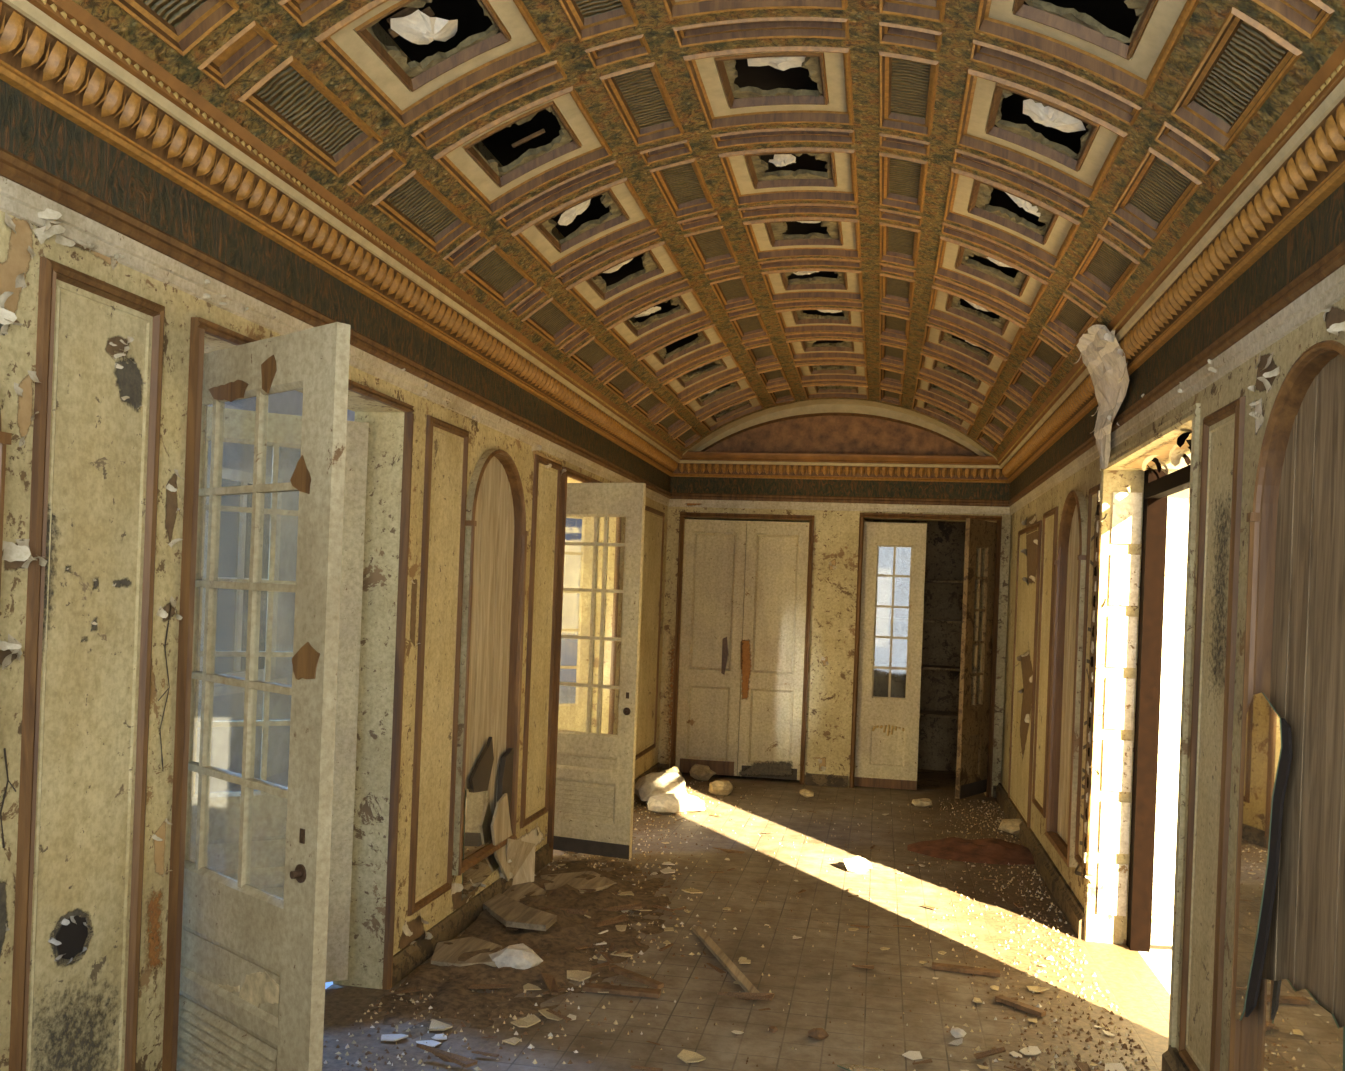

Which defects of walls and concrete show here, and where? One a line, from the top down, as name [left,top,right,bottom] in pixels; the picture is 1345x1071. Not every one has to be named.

flaking render [1074,324,1192,479]